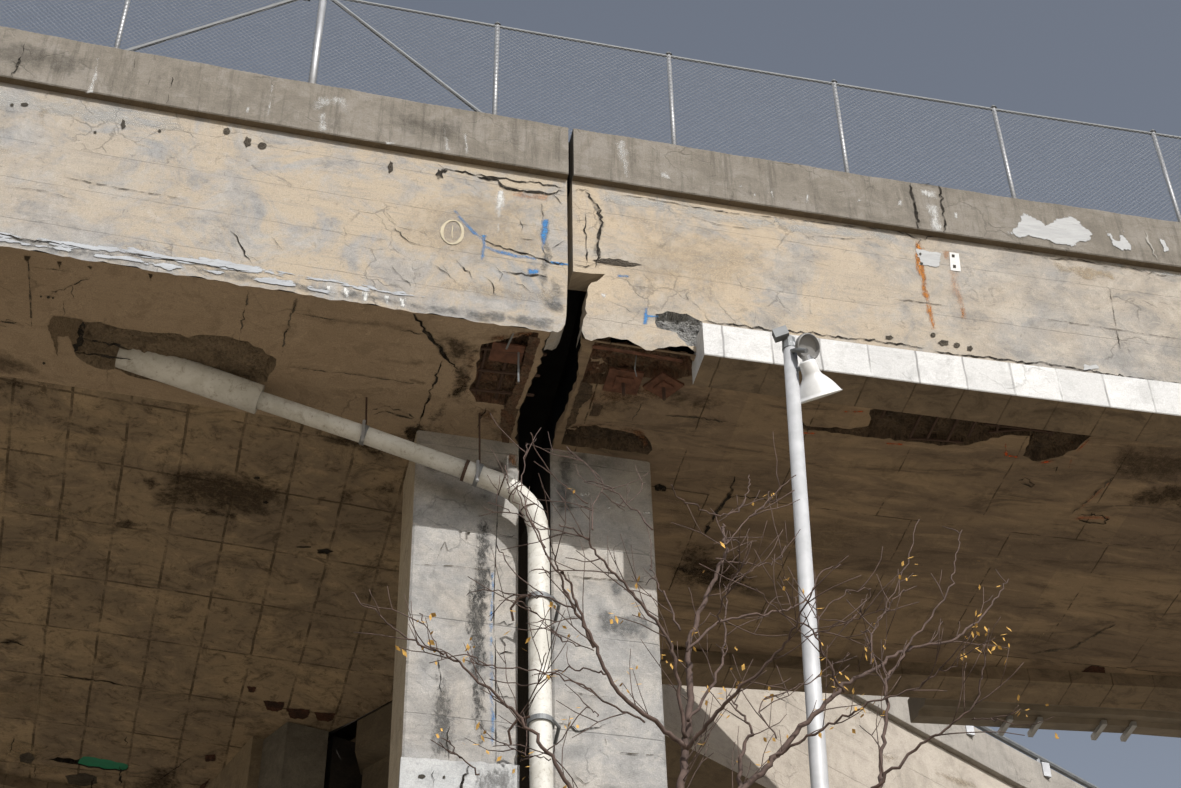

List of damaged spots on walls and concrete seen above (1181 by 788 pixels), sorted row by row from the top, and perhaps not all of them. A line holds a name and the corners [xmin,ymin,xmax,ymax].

peeling [0,232,424,297]
crack [435,166,947,295]
rust [915,244,934,327]
peeling [1007,214,1092,246]
crack [282,303,457,431]
spalling [561,381,652,455]
spalling [802,409,1091,462]
leakage [145,472,281,518]
leakage [674,545,751,591]
crack [415,506,516,740]
leakage [467,522,493,742]
crack [431,727,469,788]